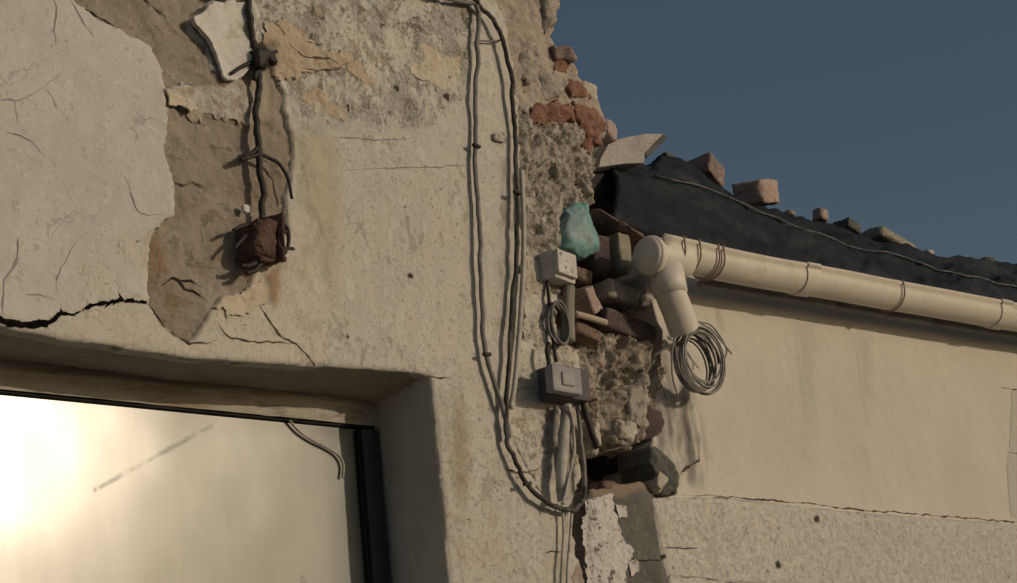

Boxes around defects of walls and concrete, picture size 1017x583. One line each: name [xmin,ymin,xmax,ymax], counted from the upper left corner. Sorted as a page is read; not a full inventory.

peeling [409,43,462,90]
spalling [496,0,617,155]
spalling [74,0,354,340]
crack [0,238,316,366]
spalling [509,256,581,498]
peeling [572,493,639,583]